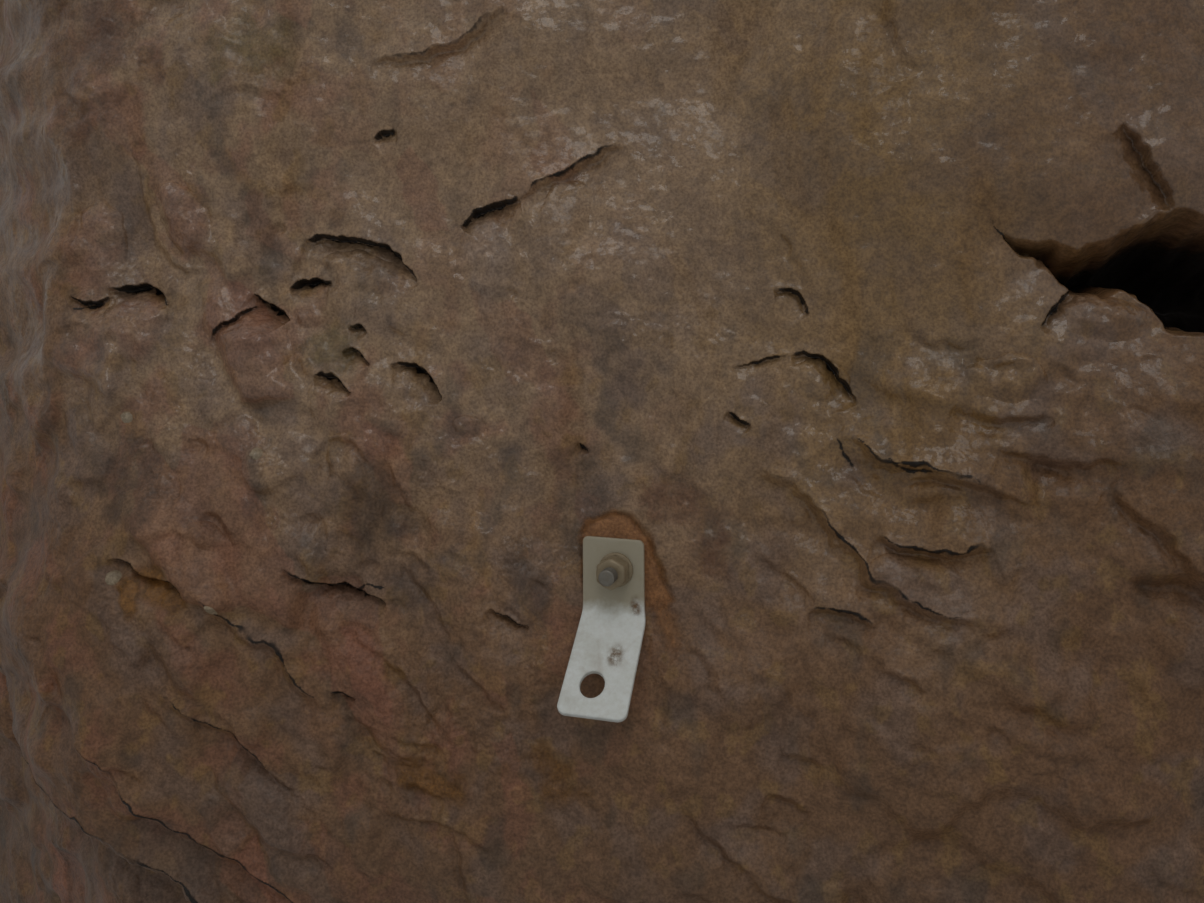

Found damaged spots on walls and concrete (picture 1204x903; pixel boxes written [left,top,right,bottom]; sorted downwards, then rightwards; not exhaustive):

crack [462,146,608,227]
crack [308,234,417,280]
crack [71,284,168,310]
crack [212,277,331,335]
crack [397,362,440,394]
crack [740,351,853,396]
crack [837,438,980,482]
crack [288,573,384,600]
crack [202,604,354,699]